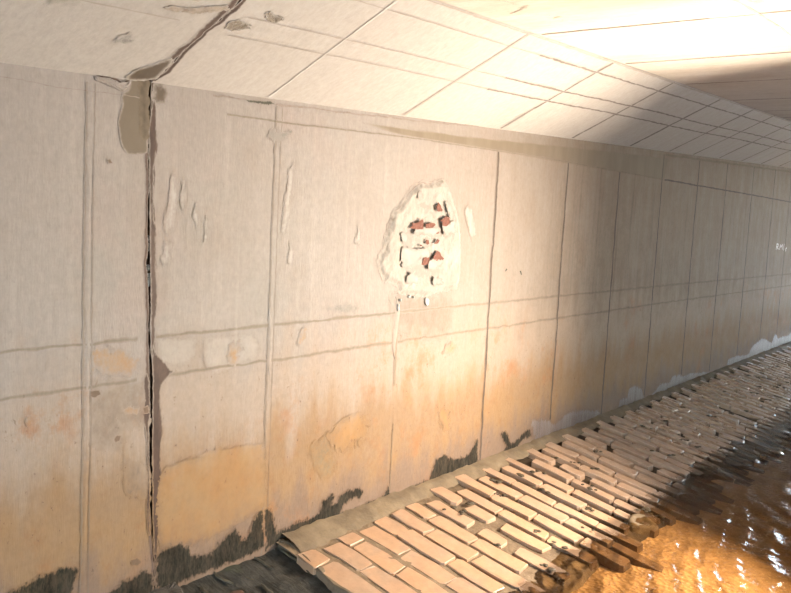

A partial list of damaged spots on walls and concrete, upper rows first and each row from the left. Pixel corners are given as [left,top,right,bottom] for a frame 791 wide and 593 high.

crack [0,0,246,118]
crack [213,94,479,127]
spalling [376,178,461,311]
crack [143,139,158,586]
damp [618,370,715,408]